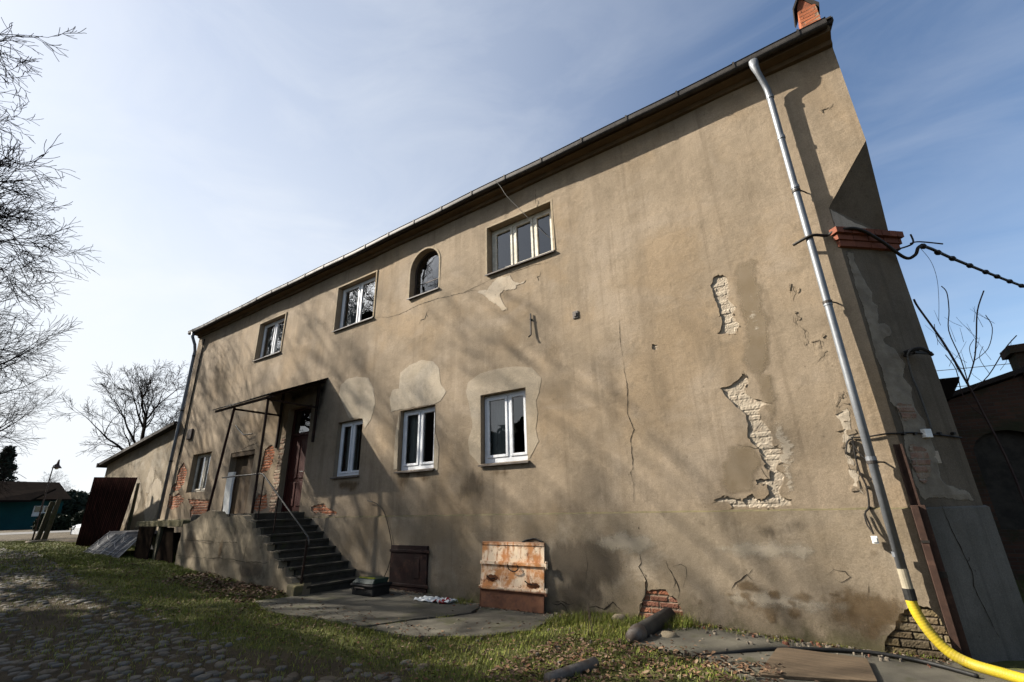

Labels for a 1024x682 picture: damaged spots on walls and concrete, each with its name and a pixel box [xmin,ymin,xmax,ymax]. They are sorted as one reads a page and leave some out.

flaking render [711,260,792,510]
flaking render [846,252,975,501]
flaking render [122,464,209,525]
crack [552,557,687,611]
flaking render [639,580,684,620]
crack [942,507,999,636]
flaking render [881,605,954,662]